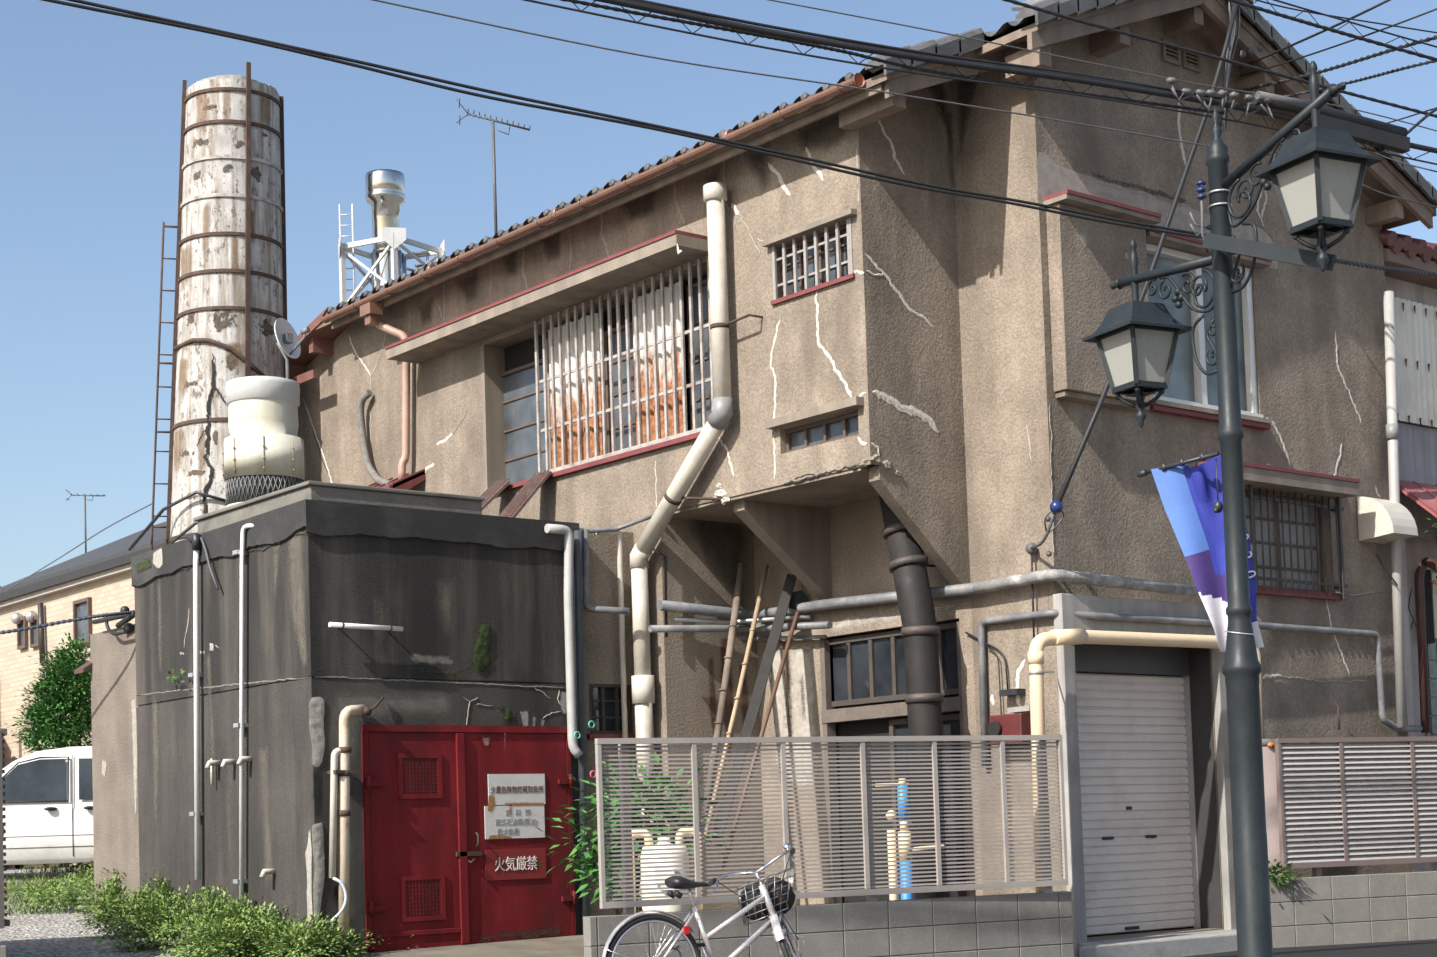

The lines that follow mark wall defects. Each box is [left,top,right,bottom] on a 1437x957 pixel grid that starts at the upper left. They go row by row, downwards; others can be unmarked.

rust [197,93,207,130]
rust [182,206,209,286]
rust [232,211,255,274]
crack [854,253,934,329]
crack [197,353,226,514]
crack [719,437,734,477]
crack [770,317,781,480]
crack [857,437,880,456]
crack [814,291,939,433]
crack [1334,332,1362,476]
flaking render [309,697,325,767]
flaking render [305,823,325,956]